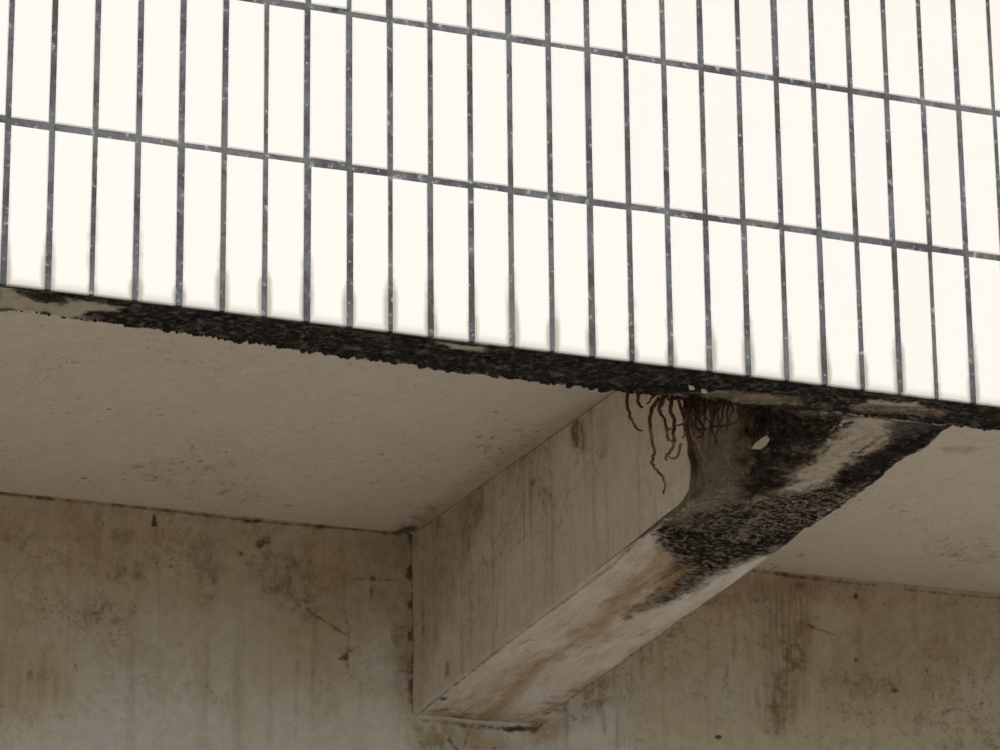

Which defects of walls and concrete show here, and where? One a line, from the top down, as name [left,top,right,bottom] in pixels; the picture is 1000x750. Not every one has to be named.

water stain [0,289,1000,620]